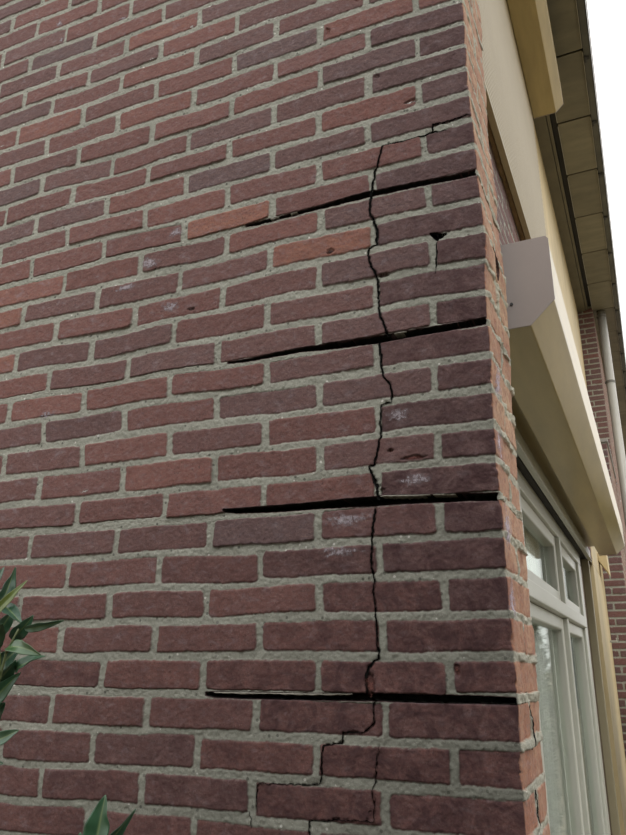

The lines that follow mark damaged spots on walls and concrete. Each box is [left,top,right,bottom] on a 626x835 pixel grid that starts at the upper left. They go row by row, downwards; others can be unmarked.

crack [207,114,536,835]